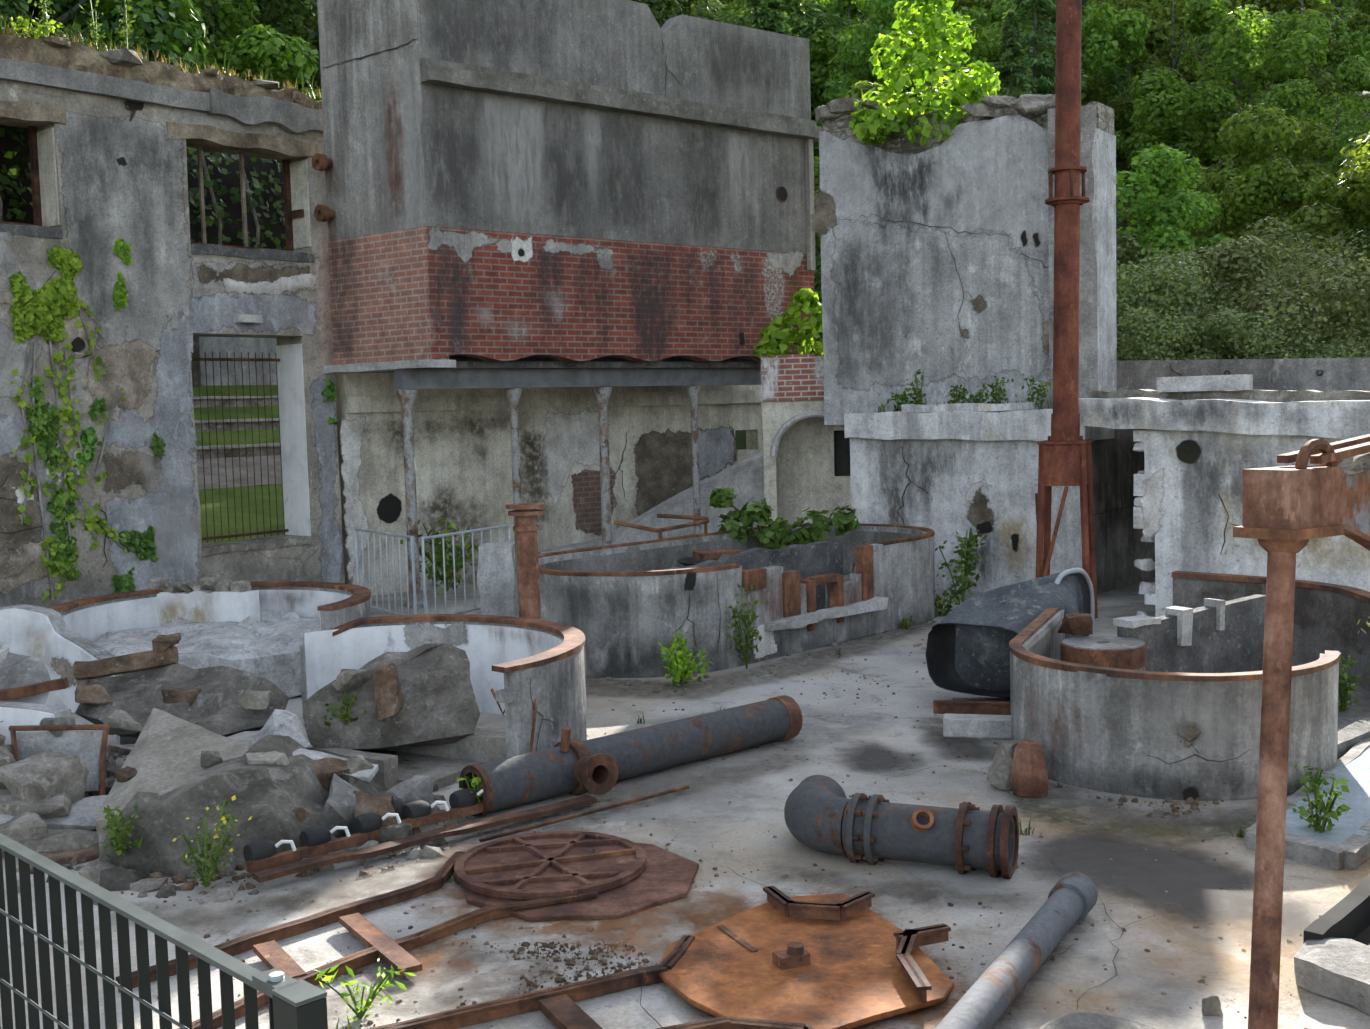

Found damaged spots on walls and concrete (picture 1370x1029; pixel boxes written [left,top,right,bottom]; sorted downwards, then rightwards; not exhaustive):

spalling [198,263,317,295]
peeling [762,257,784,320]
peeling [811,190,1049,391]
crack [0,475,46,534]
peeling [539,409,617,536]
crack [897,445,930,525]
spalling [965,478,994,536]